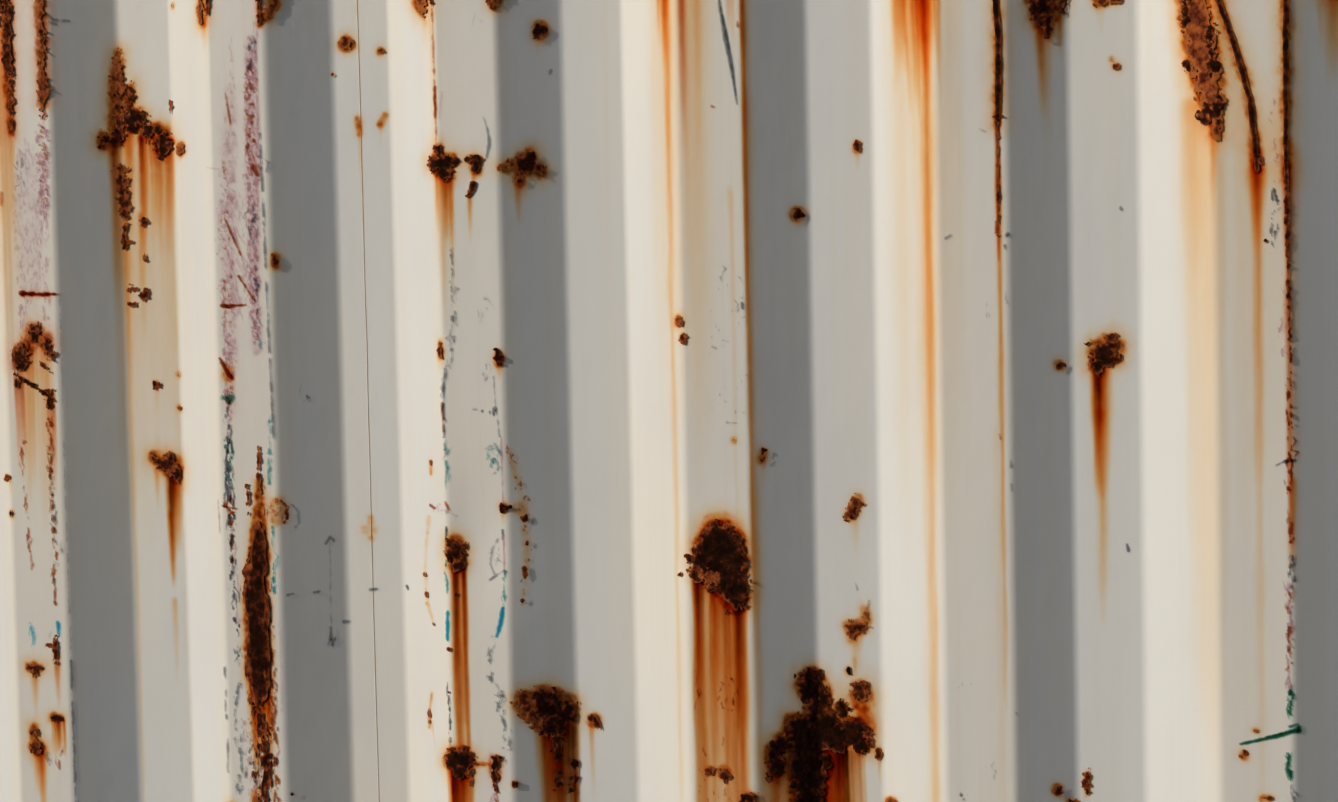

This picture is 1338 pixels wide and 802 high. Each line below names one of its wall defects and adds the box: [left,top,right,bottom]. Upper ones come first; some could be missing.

rust [1177,0,1227,141]
rust [96,47,184,262]
rust [427,144,547,198]
rust [11,321,57,410]
rust [1084,332,1124,434]
rust [149,451,183,542]
rust [240,445,290,728]
rust [445,535,467,697]
rust [677,519,755,700]
rust [509,685,602,802]
rust [738,666,882,802]
rust [1052,767,1092,802]